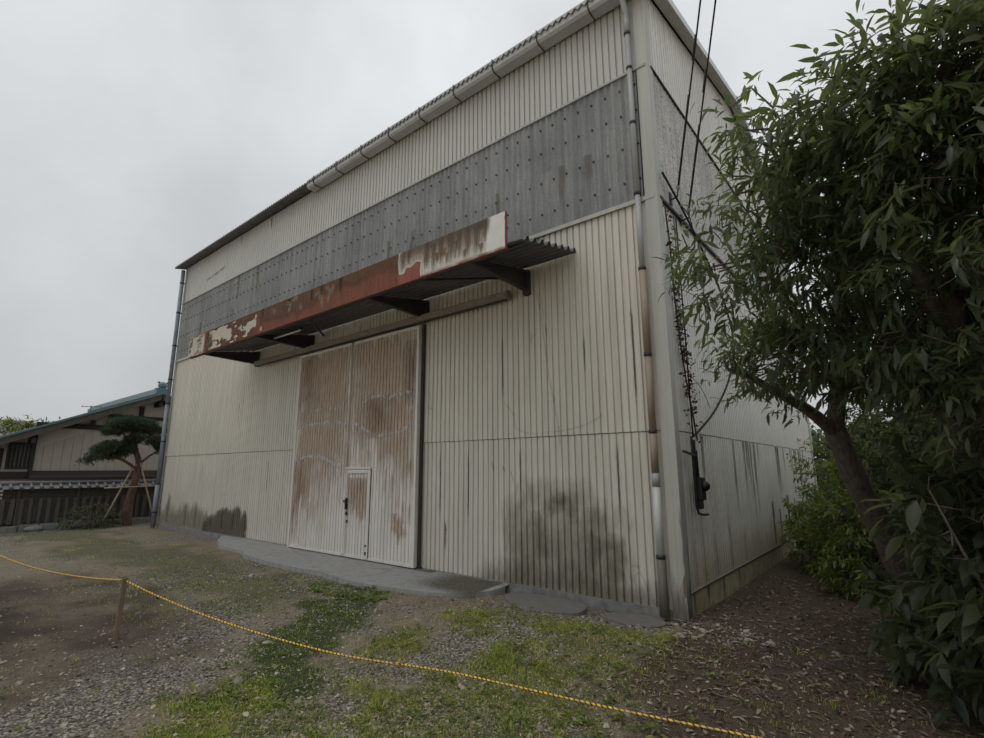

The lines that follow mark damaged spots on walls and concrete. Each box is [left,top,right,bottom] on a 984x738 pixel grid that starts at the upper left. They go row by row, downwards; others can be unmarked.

peeling [398,211,506,278]
peeling [188,314,262,358]
rust [205,254,399,352]